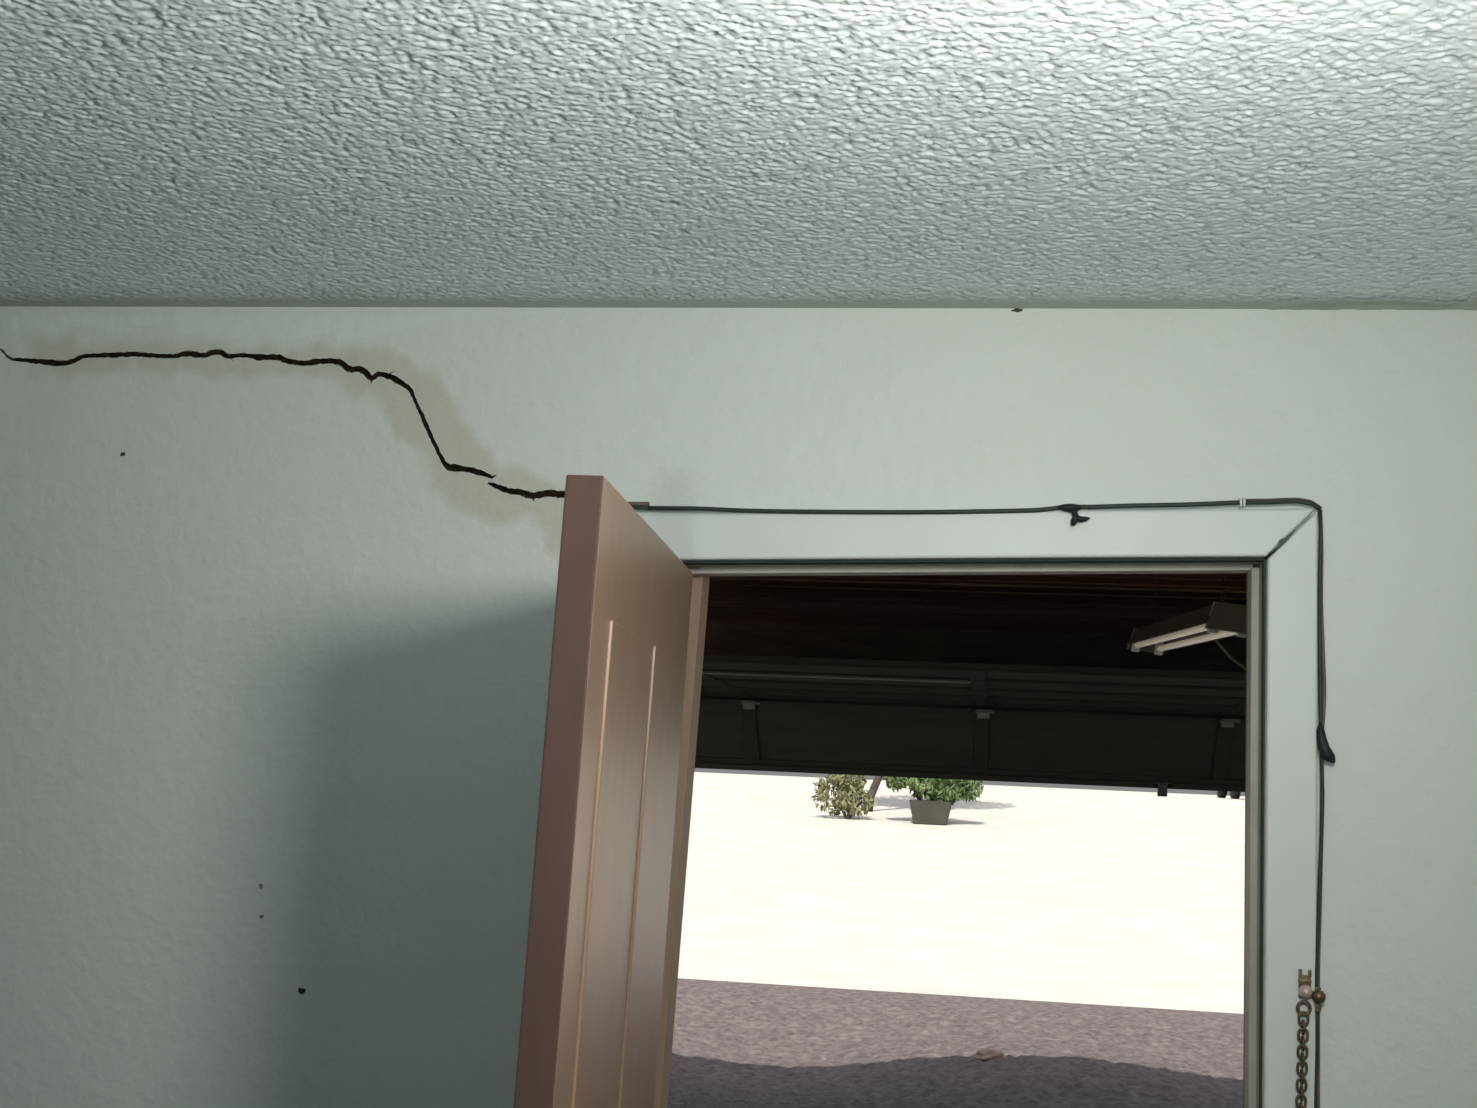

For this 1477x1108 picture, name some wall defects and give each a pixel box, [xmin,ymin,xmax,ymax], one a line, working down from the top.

crack [0,348,565,501]
damp [15,325,566,567]